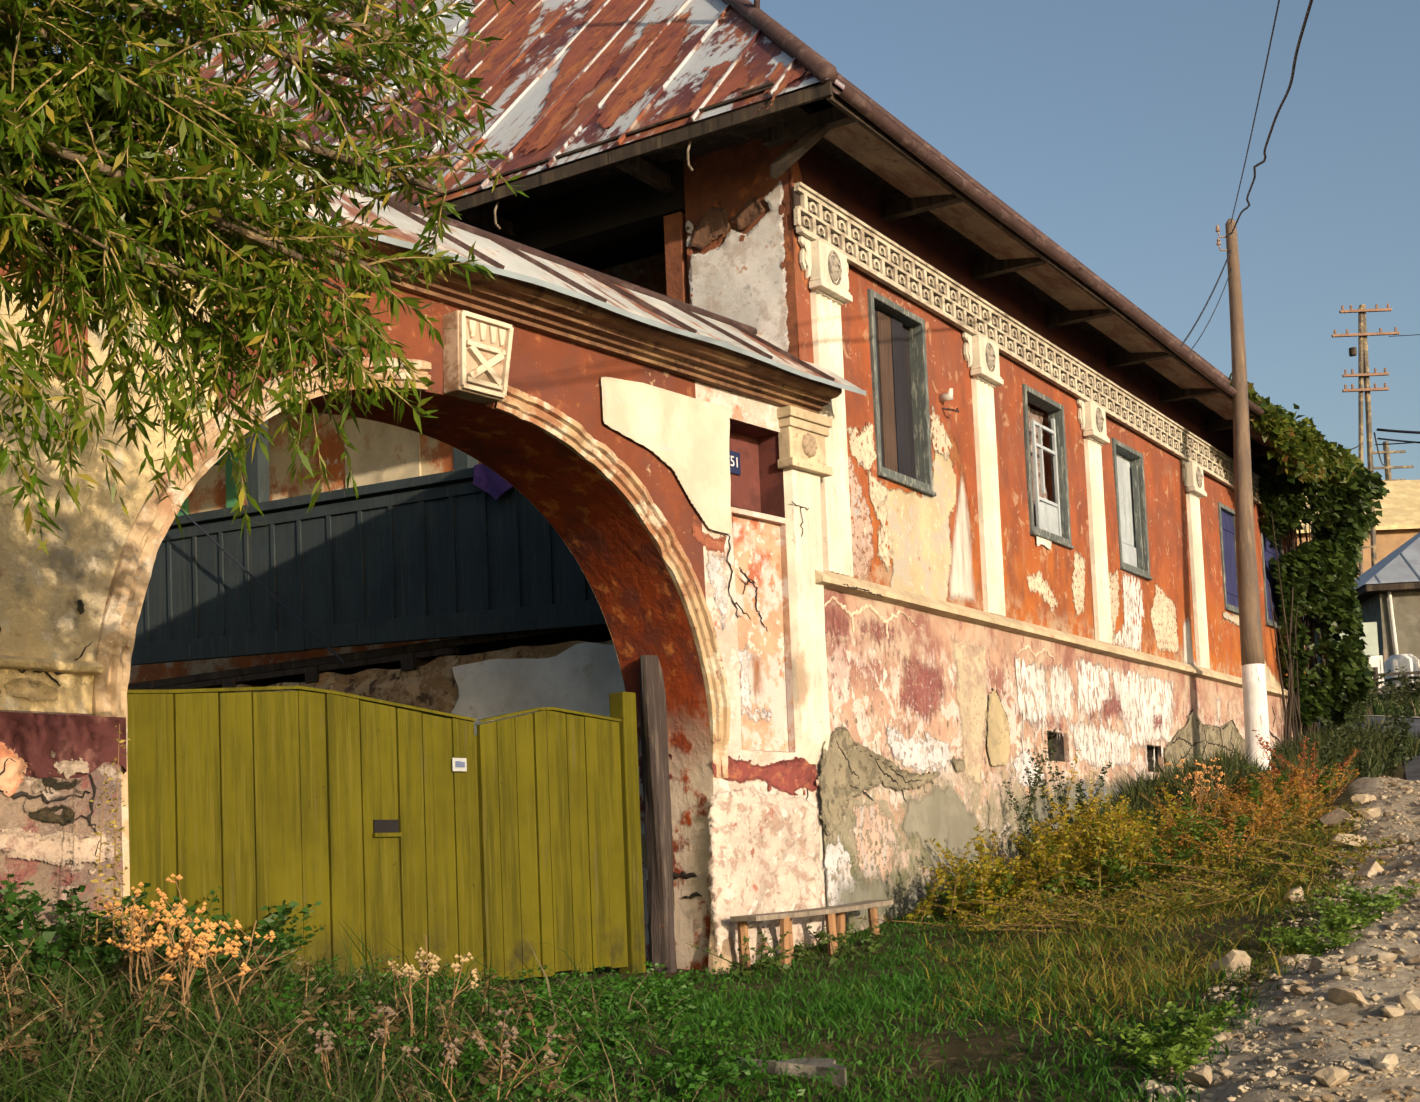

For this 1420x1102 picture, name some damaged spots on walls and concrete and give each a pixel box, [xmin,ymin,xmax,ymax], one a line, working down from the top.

rust [462,0,544,121]
rust [519,0,692,155]
rust [684,58,811,123]
peeling [685,181,790,352]
peeling [847,406,957,602]
crack [726,536,768,632]
peeling [0,742,111,874]
spalling [711,640,1246,906]